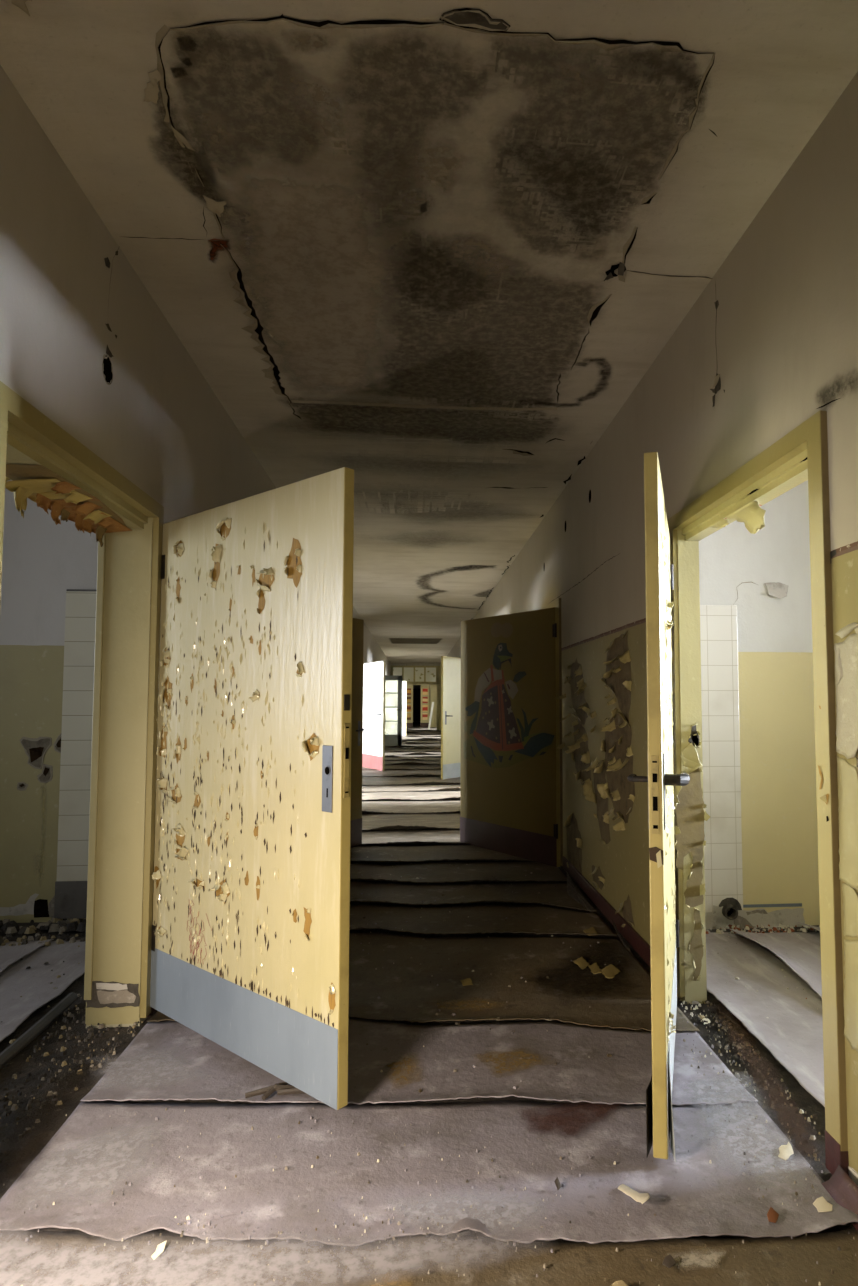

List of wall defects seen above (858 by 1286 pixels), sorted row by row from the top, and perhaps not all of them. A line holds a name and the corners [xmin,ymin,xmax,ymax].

damp [172,36,610,442]
crack [104,14,719,419]
damp [491,43,701,250]
crack [710,350,725,407]
peeling [5,464,132,547]
damp [417,565,493,609]
peeling [709,501,766,534]
flaking render [0,893,55,918]
spalling [17,734,61,823]
peeling [556,631,635,845]
peeling [656,534,805,1043]
peeling [818,634,858,1051]